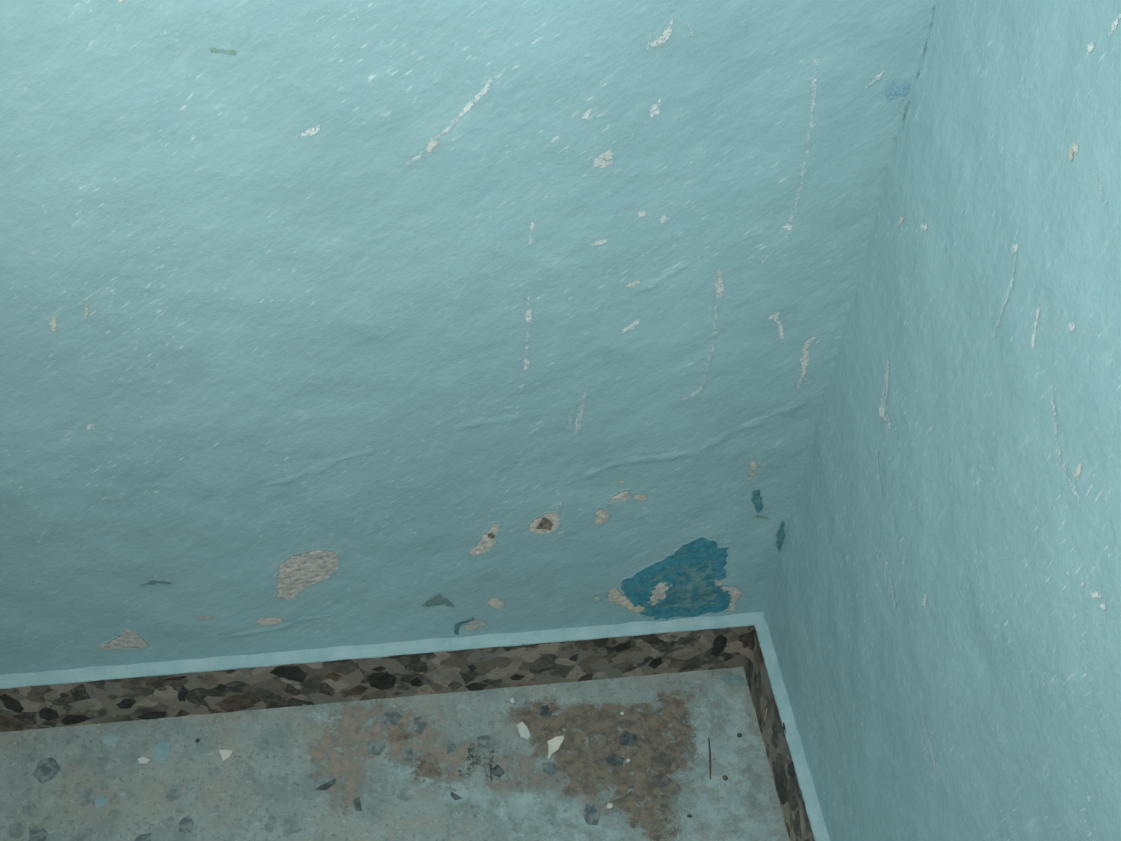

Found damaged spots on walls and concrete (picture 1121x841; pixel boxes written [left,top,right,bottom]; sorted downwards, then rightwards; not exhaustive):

spalling [466,522,503,557]
spalling [526,499,564,535]
spalling [273,548,342,601]
peeling [592,535,743,621]